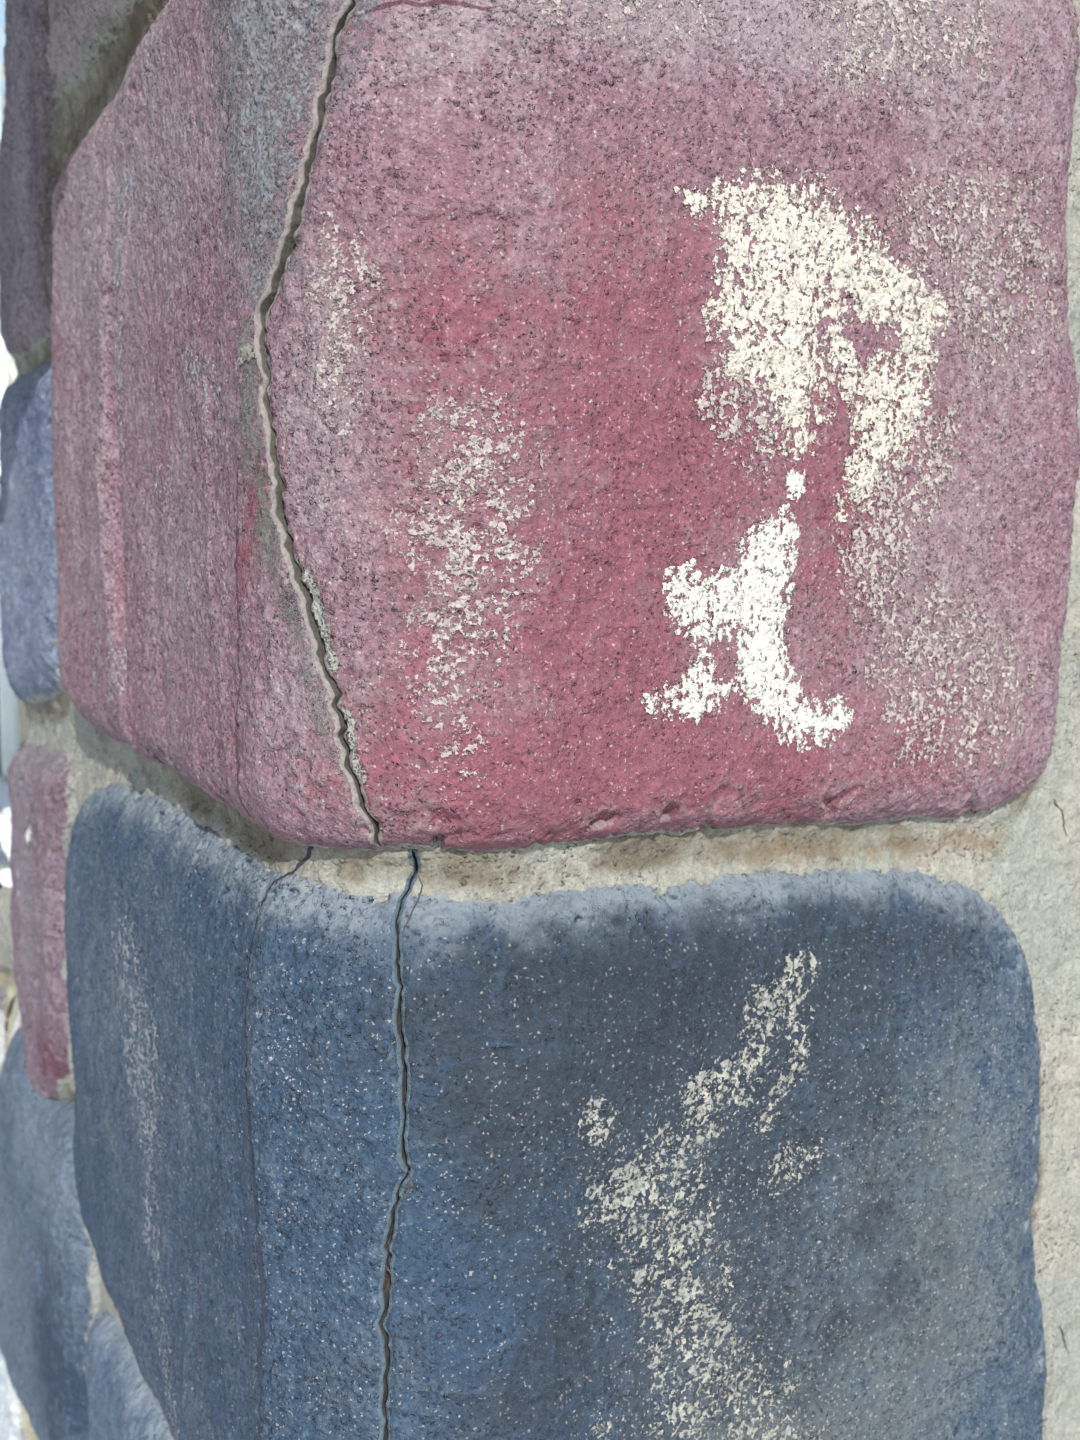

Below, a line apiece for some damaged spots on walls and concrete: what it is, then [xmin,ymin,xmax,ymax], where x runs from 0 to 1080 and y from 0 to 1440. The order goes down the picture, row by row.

peeling [802,0,1004,119]
crack [232,0,502,1440]
peeling [641,149,1066,790]
peeling [576,950,834,1440]